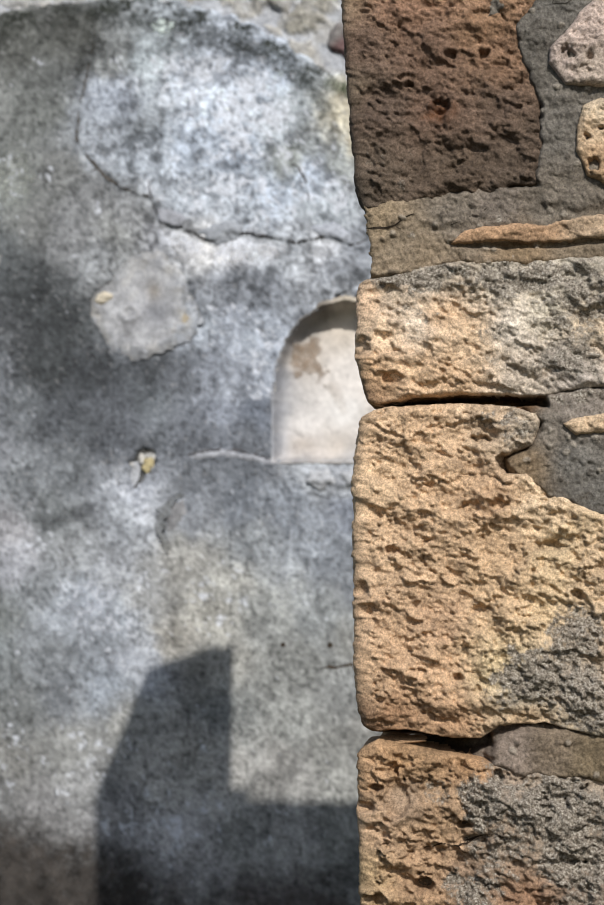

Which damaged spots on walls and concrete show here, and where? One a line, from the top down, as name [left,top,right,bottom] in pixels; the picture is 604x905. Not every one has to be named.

crack [73,34,149,197]
spalling [322,72,354,157]
flaking render [148,181,368,246]
crack [292,163,310,198]
spalling [90,248,205,361]
spalling [129,449,157,489]
damp [0,821,157,905]